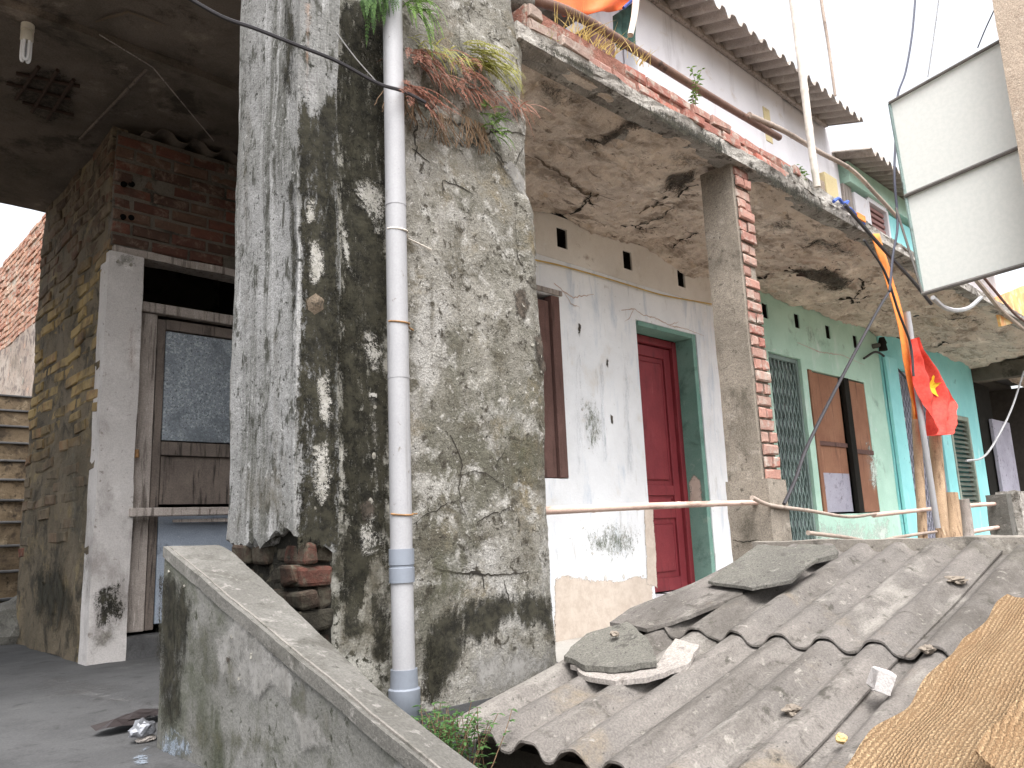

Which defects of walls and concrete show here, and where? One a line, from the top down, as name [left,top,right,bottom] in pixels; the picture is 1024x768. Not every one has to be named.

crack [621,184,699,249]
water stain [282,0,391,660]
crack [838,278,872,304]
crack [413,435,512,525]
water stain [95,584,126,645]
spalling [232,531,334,644]
crack [438,569,529,603]
water stain [420,561,556,704]
peeling [554,509,657,642]